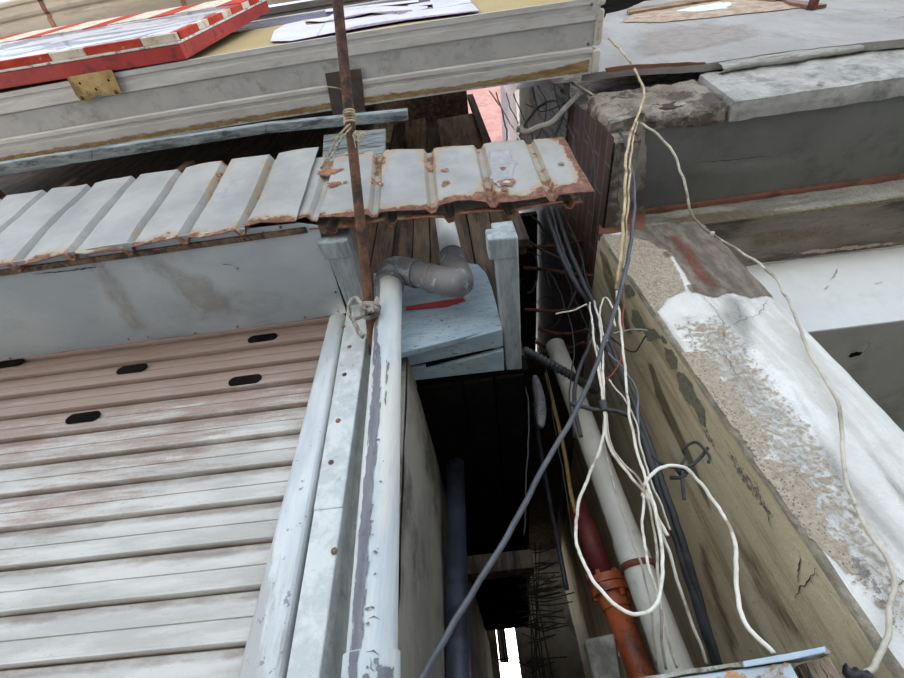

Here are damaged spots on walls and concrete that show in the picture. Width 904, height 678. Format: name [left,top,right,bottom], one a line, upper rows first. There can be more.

rust [317,168,348,188]
rust [497,167,516,191]
peeling [603,234,685,315]
crack [710,300,766,382]
peeling [348,316,394,678]
peeling [631,309,904,619]
crack [795,558,815,598]
peeling [717,661,788,678]